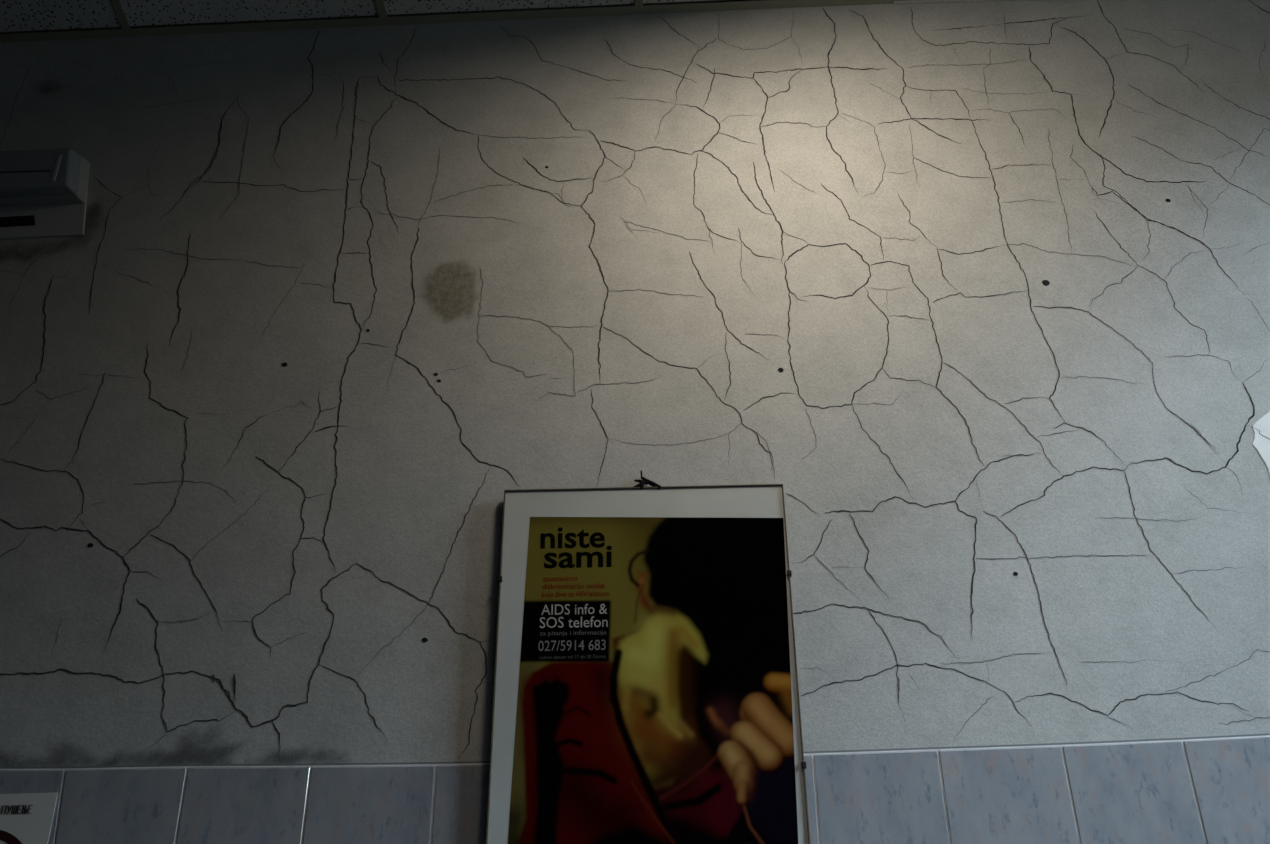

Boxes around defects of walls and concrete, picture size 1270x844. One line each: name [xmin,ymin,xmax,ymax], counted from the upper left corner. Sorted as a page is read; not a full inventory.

crack [0,28,518,760]
crack [439,76,576,130]
crack [477,1,1270,683]
crack [793,604,1270,741]